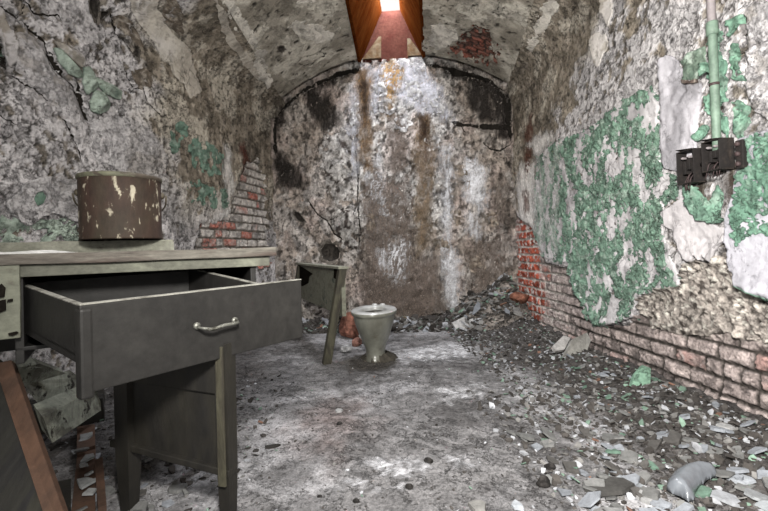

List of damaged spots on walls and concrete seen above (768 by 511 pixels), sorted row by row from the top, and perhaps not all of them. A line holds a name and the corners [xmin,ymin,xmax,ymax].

flaking render [0,7,19,68]
peeling [0,176,79,242]
crack [0,0,88,161]
peeling [53,41,123,114]
flaking render [169,121,270,250]
leakage [271,145,303,190]
leakage [307,62,454,176]
leakage [361,113,505,317]
flaking render [447,24,502,67]
leakage [442,66,510,139]
leakage [464,131,553,238]
peeling [515,0,768,419]